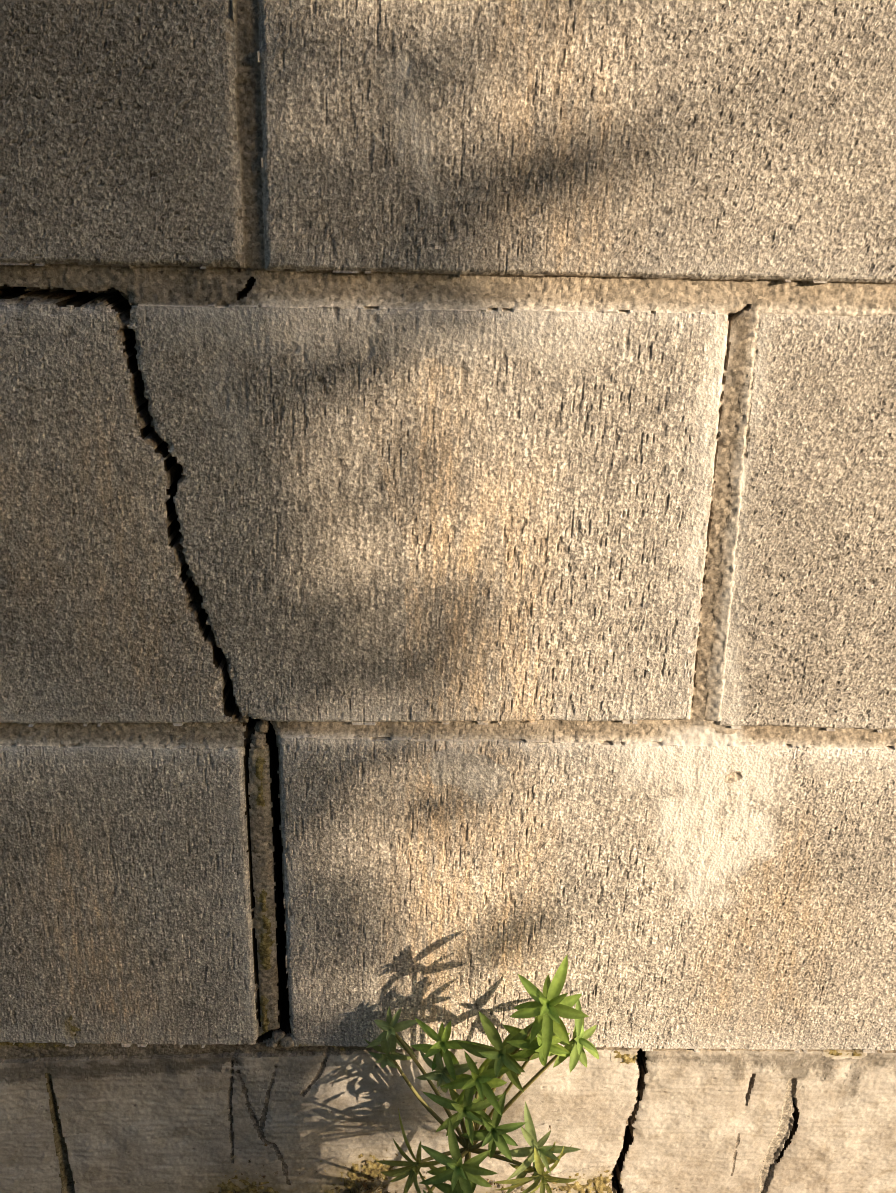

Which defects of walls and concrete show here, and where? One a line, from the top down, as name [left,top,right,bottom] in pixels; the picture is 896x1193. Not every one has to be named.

crack [236,277,256,300]
crack [0,284,330,1193]
crack [609,1048,648,1193]